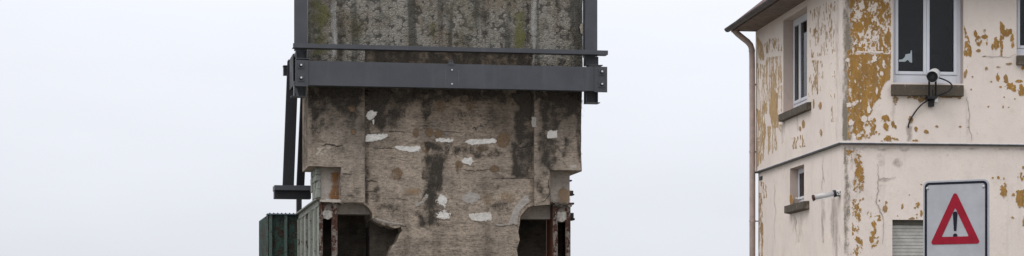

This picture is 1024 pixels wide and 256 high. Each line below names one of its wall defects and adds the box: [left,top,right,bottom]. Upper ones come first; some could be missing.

rust [330,173,339,199]
damp [302,87,582,227]
peeling [756,38,783,166]
peeling [808,0,926,256]
peeling [941,21,1024,108]
peeling [992,166,1024,226]